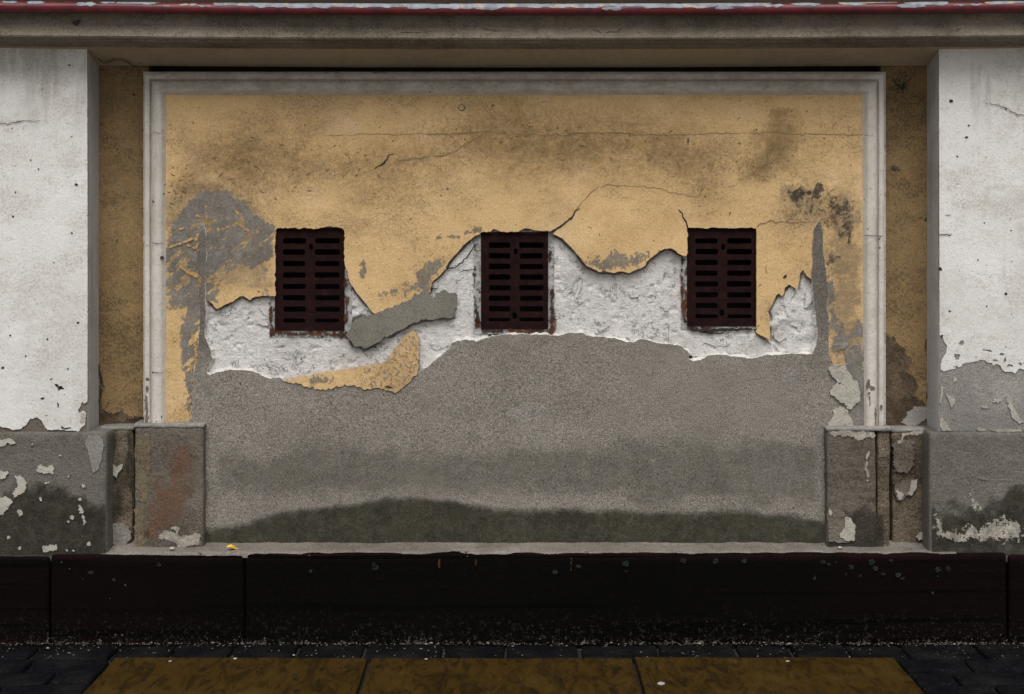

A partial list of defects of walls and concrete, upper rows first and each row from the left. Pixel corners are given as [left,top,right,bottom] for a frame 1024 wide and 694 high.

crack [169,122,874,233]
leakage [826,189,853,243]
corrosion [268,278,350,338]
flaking render [160,189,488,422]
corrosion [472,268,556,334]
flaking render [550,234,816,358]
corrosion [680,256,714,329]
peeling [827,275,1024,433]
flaking render [0,377,162,547]
leakage [159,430,825,547]
flaking render [826,505,856,543]
flaking render [891,439,918,501]